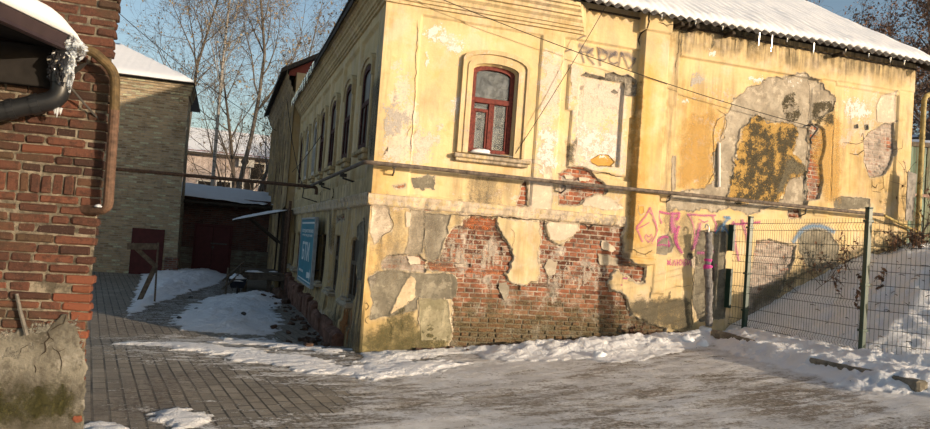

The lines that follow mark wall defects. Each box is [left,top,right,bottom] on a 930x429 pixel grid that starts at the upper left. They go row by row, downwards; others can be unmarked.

peeling [422,22,465,68]
spalling [357,51,668,347]
damp [725,91,840,206]
flaking render [666,72,903,219]
crack [19,316,66,373]